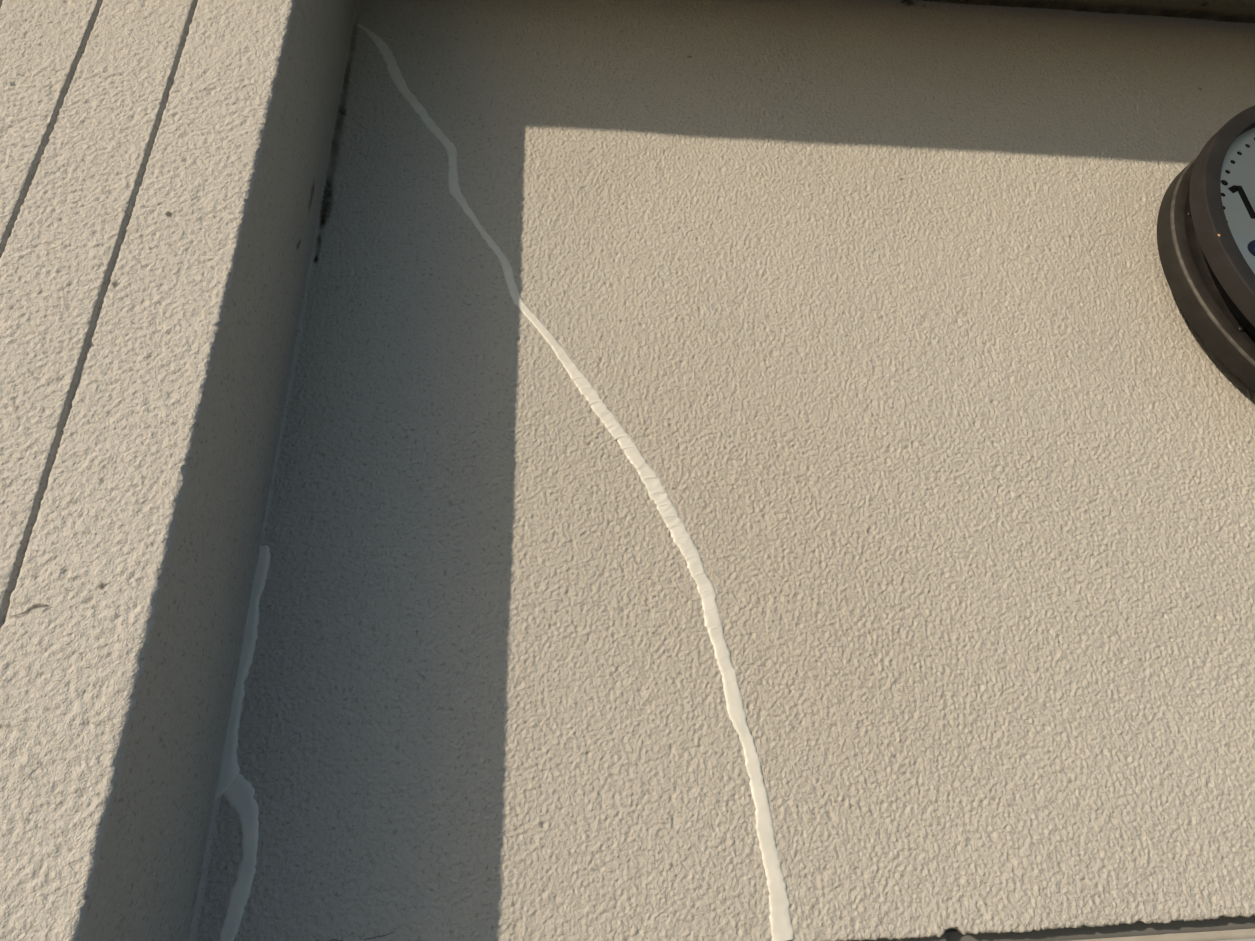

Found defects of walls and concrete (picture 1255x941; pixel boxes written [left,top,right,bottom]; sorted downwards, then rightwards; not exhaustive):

crack [215,545,271,941]
crack [356,24,794,941]